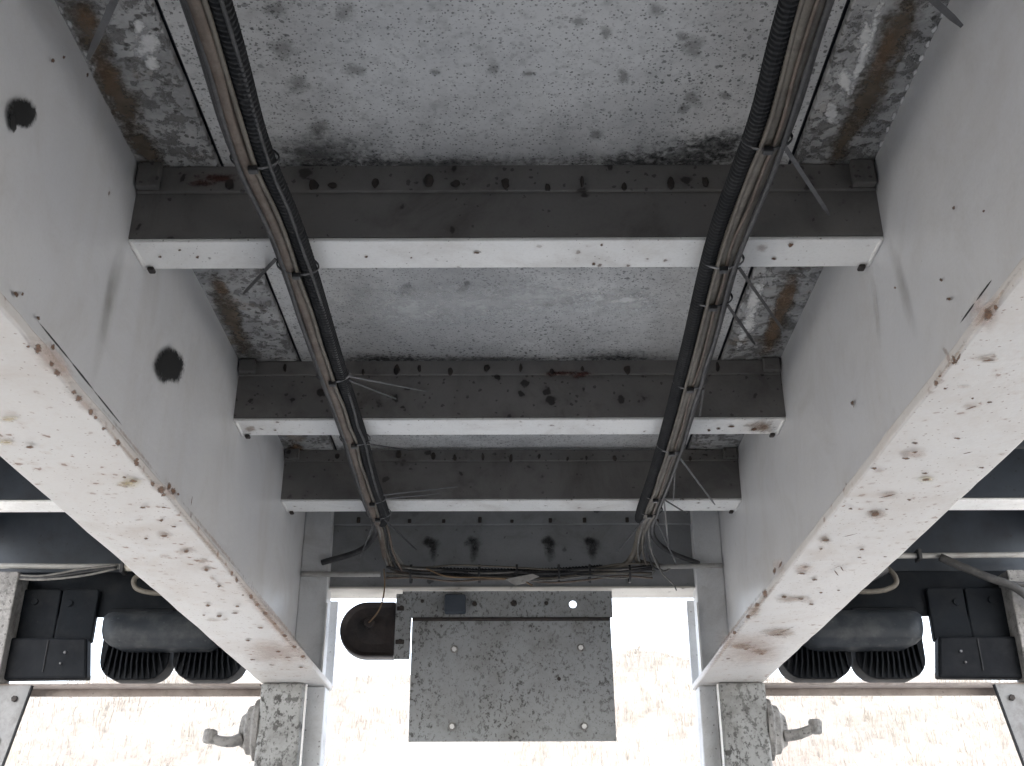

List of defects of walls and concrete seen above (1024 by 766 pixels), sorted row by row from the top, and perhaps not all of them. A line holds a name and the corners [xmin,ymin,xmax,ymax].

corrosion [65,0,164,164]
corrosion [828,0,918,161]
mould [606,137,738,165]
corrosion [211,275,250,354]
corrosion [763,274,796,354]